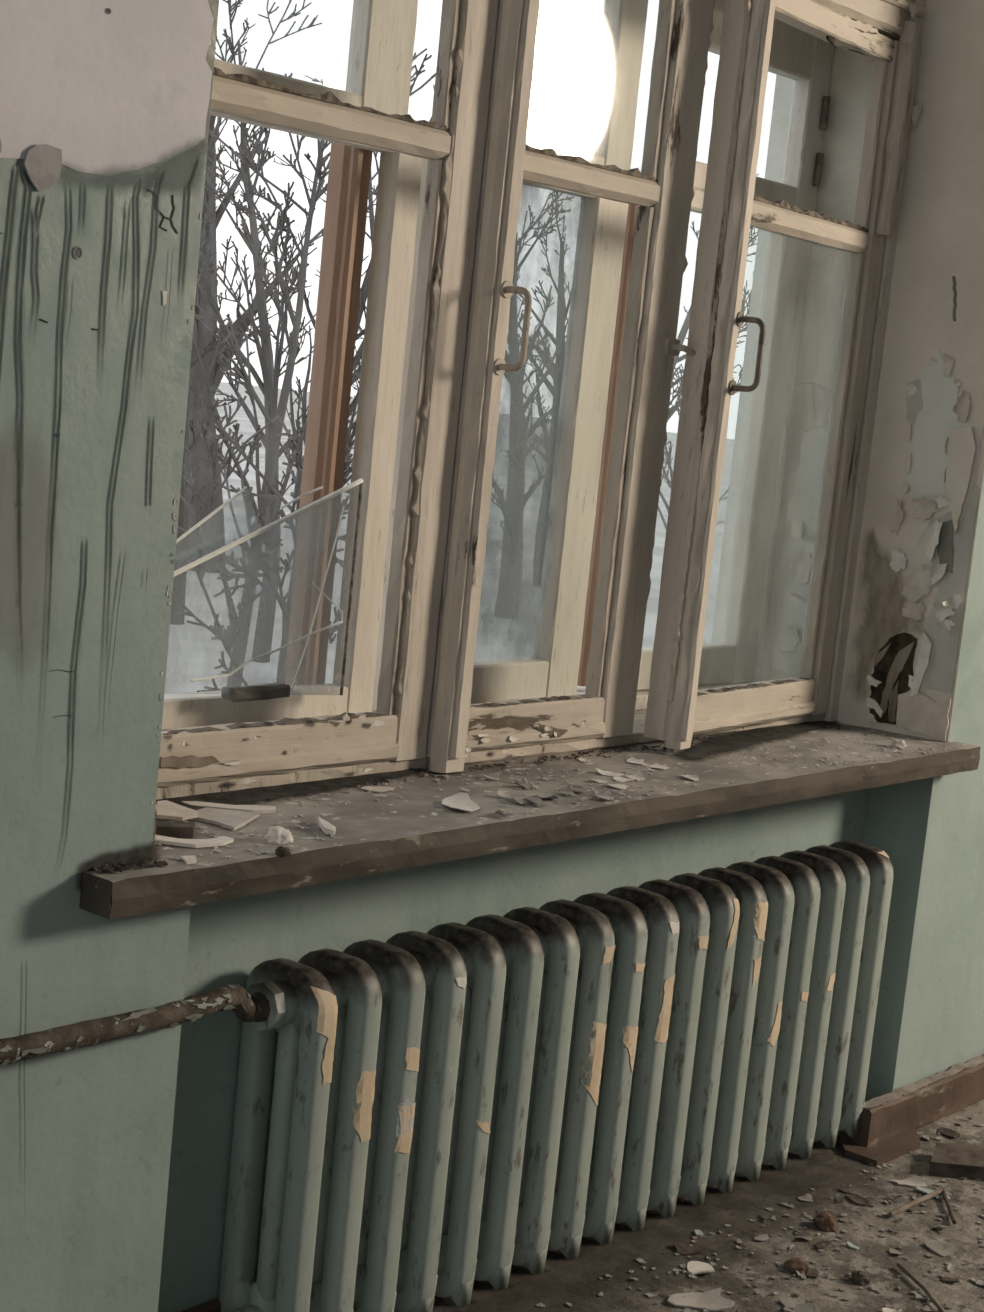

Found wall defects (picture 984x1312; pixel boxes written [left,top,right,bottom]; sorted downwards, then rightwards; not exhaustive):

peeling [22,144,62,192]
crack [147,189,178,234]
peeling [888,349,979,741]